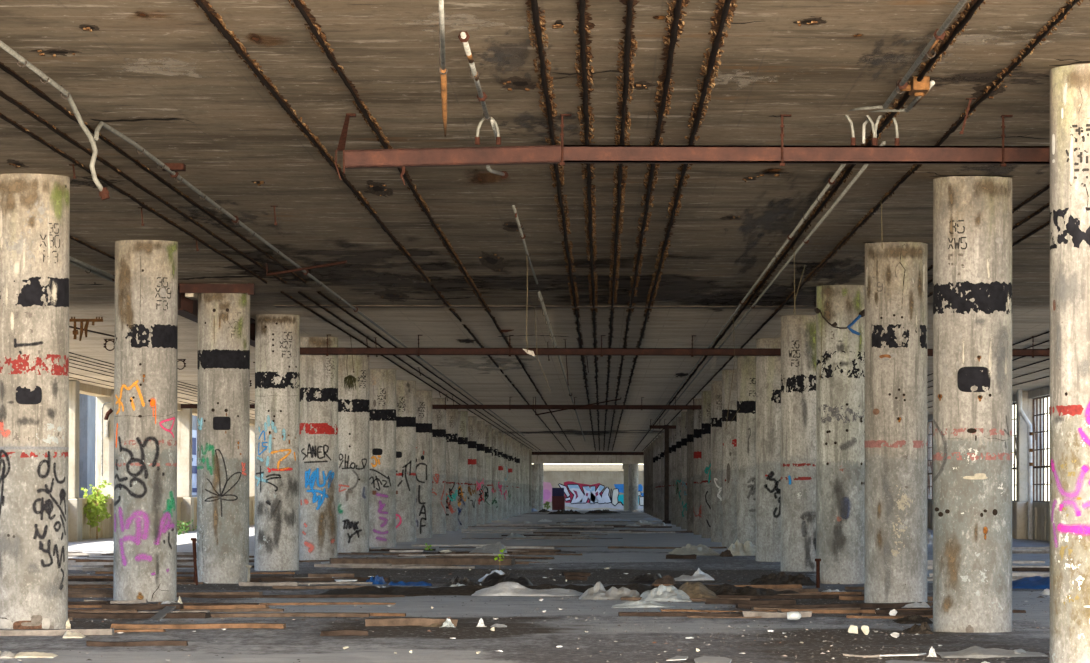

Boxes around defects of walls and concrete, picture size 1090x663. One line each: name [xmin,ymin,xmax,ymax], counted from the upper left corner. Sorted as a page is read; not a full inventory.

rust [194,0,341,169]
rust [526,10,557,118]
rust [614,39,638,145]
rust [653,0,688,47]
rust [685,0,738,140]
crack [1050,59,1090,119]
water stain [5,244,25,330]
water stain [0,176,118,249]
water stain [200,293,246,348]
water stain [215,174,925,327]
rust [549,164,671,313]
water stain [318,480,336,553]